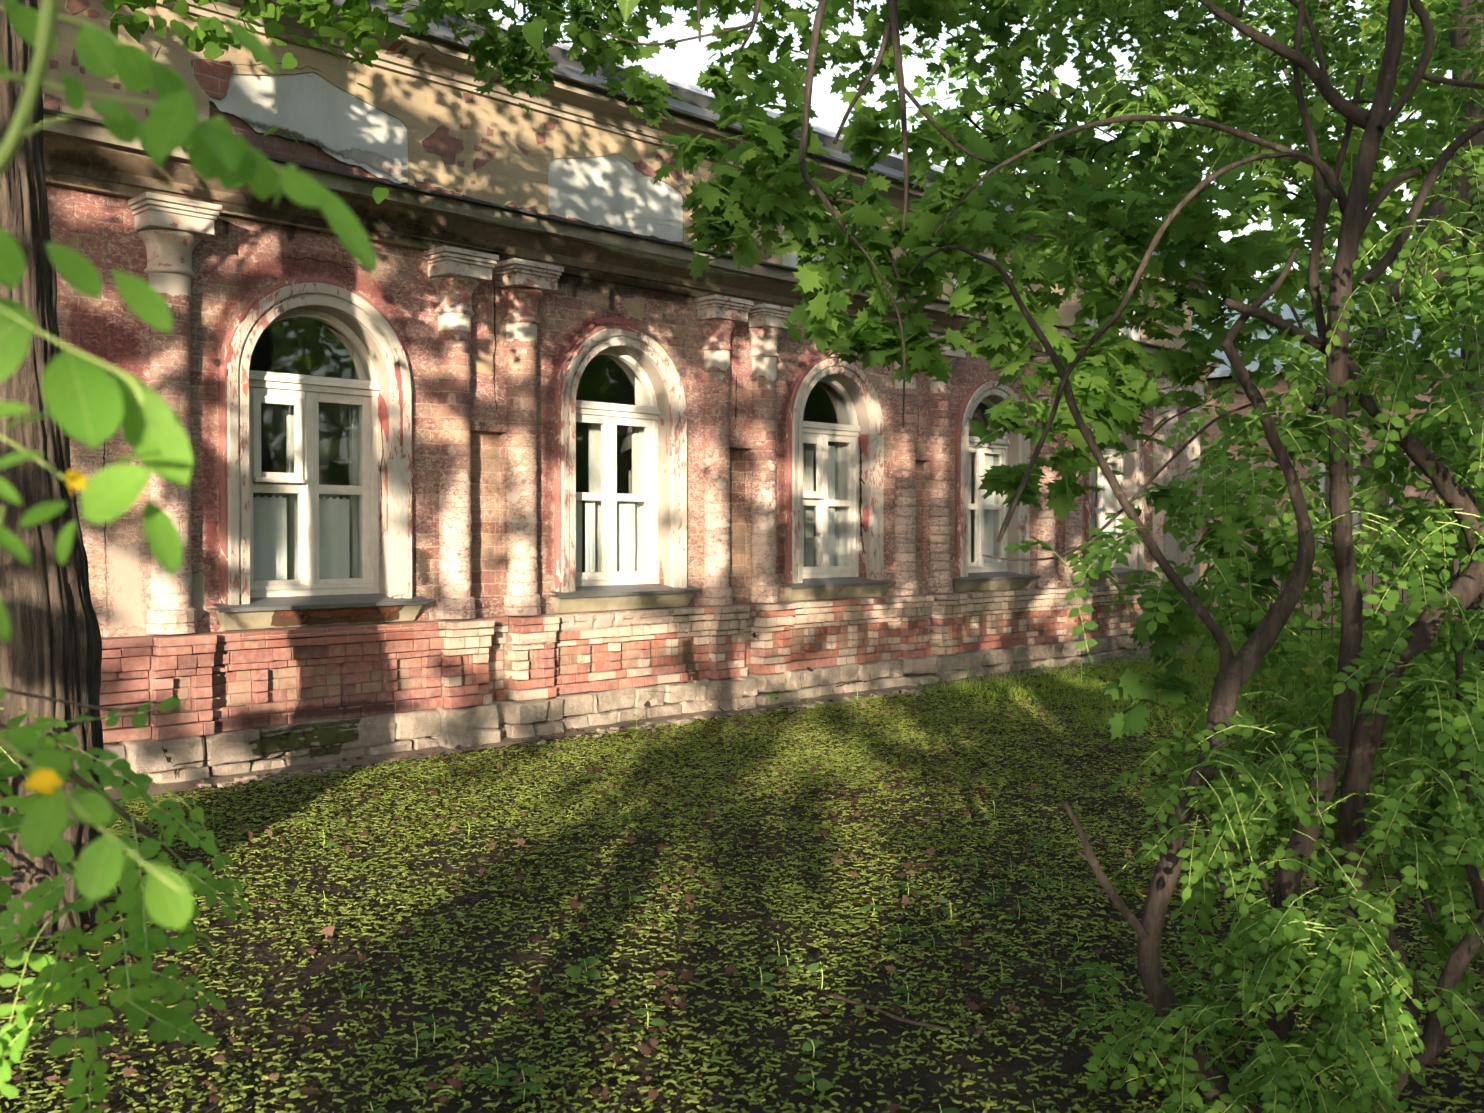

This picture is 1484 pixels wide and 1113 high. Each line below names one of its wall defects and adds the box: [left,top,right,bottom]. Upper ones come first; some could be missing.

spalling [191,58,683,244]
damp [213,700,419,758]